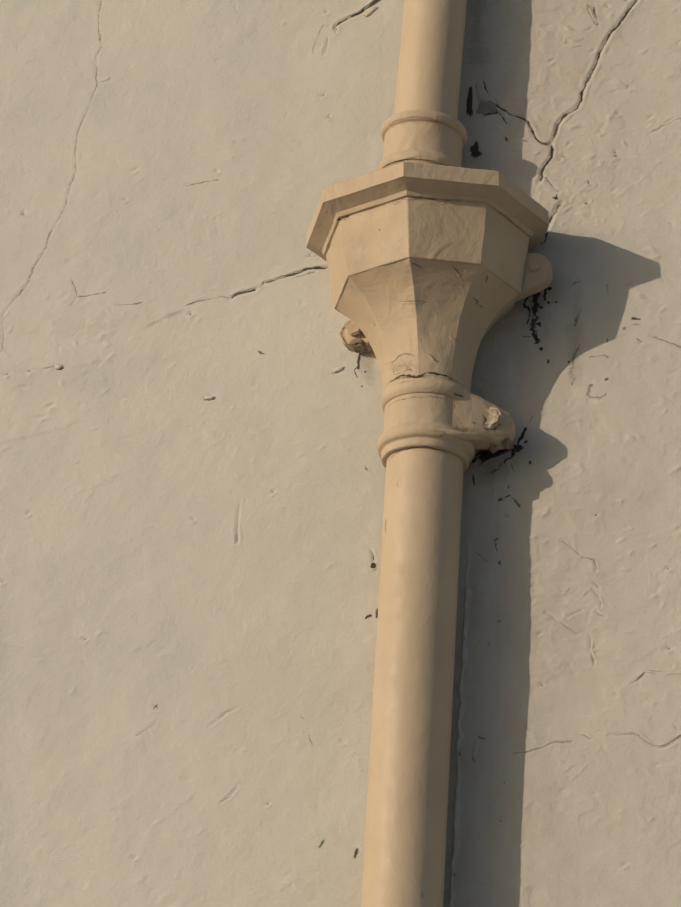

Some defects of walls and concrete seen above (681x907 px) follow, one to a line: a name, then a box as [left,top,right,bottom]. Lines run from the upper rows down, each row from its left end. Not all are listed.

crack [336,0,381,30]
spalling [467,82,498,117]
crack [496,0,640,192]
spalling [470,142,482,157]
crack [229,264,328,298]
crack [77,289,143,305]
crack [512,730,681,754]